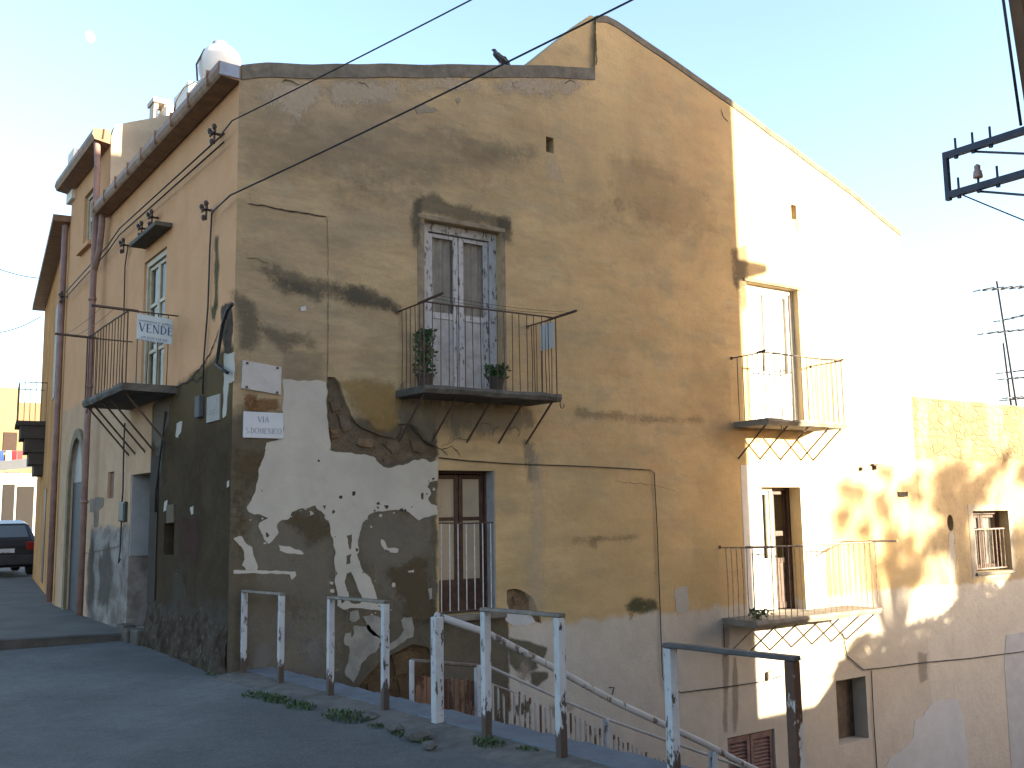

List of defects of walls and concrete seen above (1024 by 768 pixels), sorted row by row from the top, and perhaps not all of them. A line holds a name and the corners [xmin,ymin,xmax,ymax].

water stain [211,237,233,353]
flaking render [233,377,438,702]
water stain [86,543,111,606]
flaking render [505,589,540,626]
water stain [628,598,656,613]